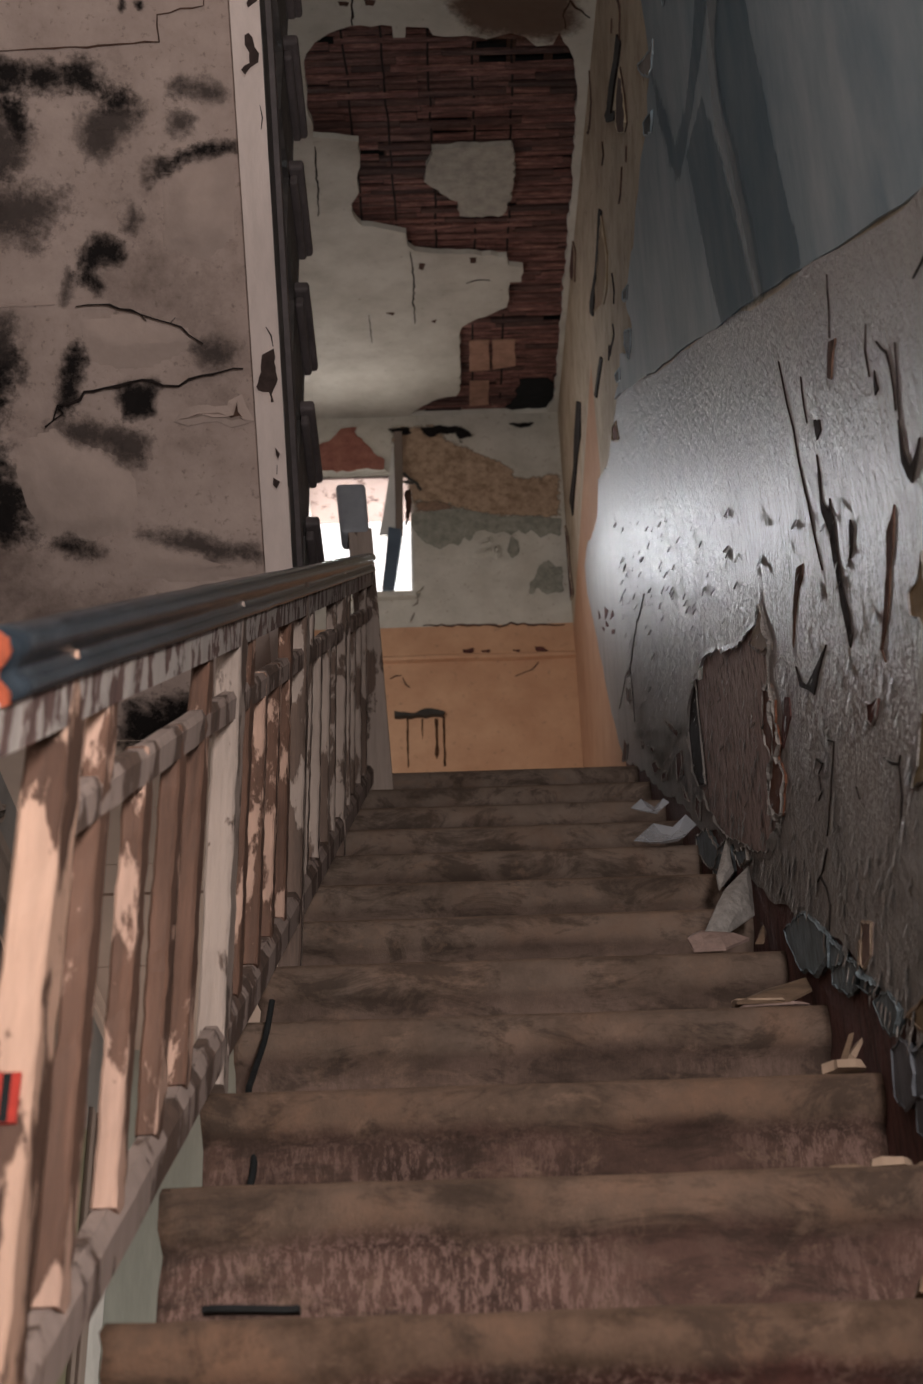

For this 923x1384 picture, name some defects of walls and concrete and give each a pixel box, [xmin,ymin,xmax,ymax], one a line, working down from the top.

crack [0,0,204,51]
water stain [0,55,145,176]
water stain [144,140,237,181]
water stain [62,208,141,301]
water stain [0,316,25,413]
water stain [56,342,160,466]
crack [45,304,243,428]
flaking render [304,25,632,600]
peeling [827,338,837,379]
water stain [0,447,35,546]
flaking render [598,420,923,1138]
flaking render [828,1156,923,1168]